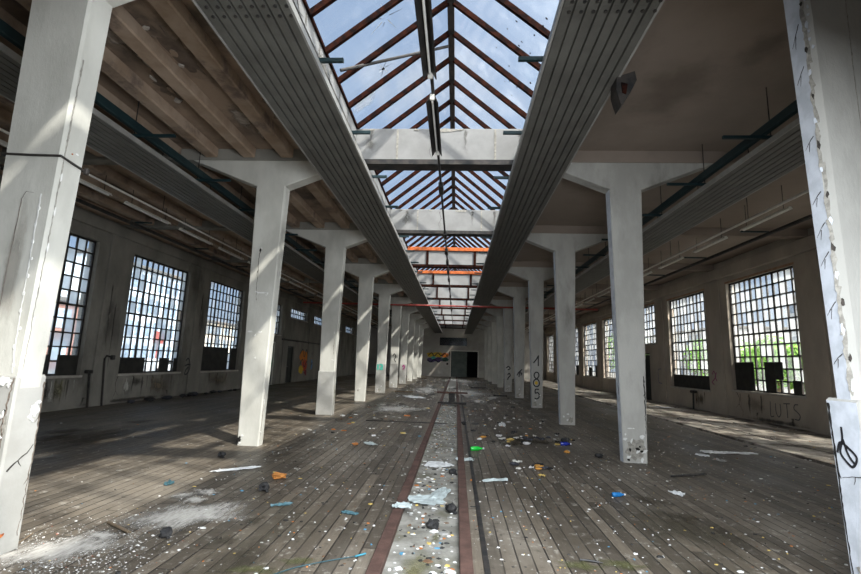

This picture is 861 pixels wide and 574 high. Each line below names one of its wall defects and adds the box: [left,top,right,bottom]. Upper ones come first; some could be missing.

crack [0,60,84,535]
spalling [799,0,856,395]